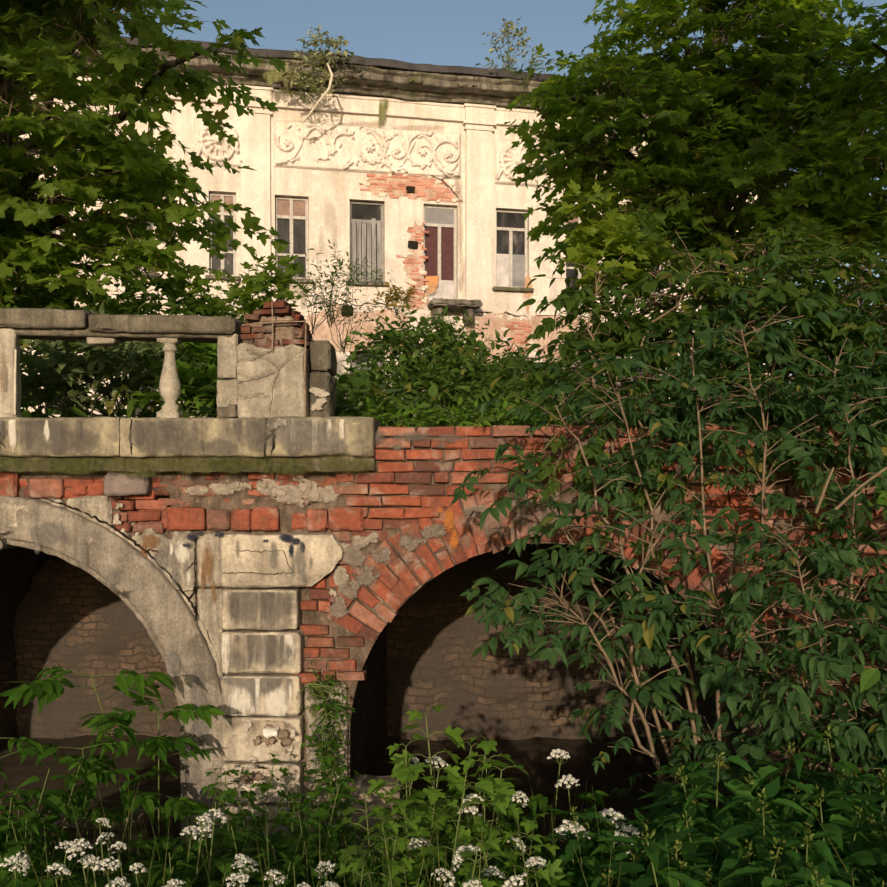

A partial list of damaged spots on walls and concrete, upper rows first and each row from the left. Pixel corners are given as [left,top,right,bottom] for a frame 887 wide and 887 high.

flaking render [359,173,463,203]
flaking render [306,219,429,353]
crack [240,348,305,454]
peeling [185,474,357,507]
crack [42,497,224,676]
peeling [329,532,392,621]
peeling [398,524,446,551]
spalling [235,722,296,785]